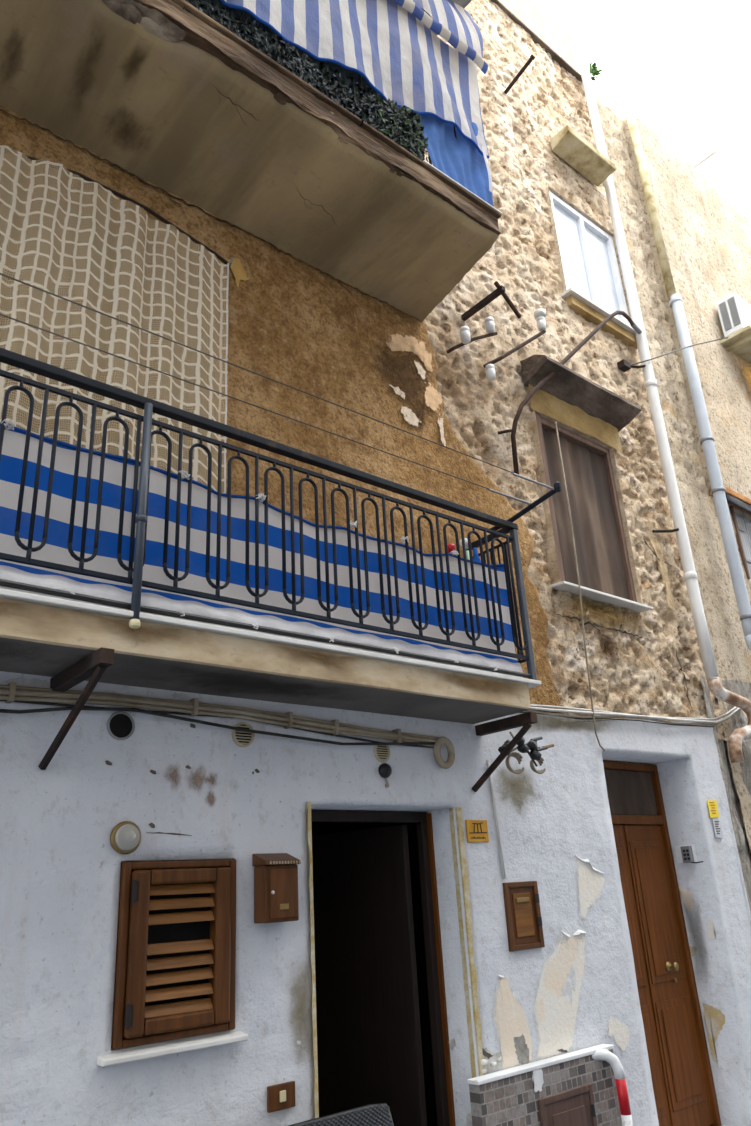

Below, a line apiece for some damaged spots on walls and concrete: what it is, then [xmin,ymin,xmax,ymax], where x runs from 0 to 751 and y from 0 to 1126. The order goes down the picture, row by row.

spalling [102,0,463,212]
flaking render [386,333,446,446]
peeling [449,807,605,1092]
peeling [702,1004,725,1064]